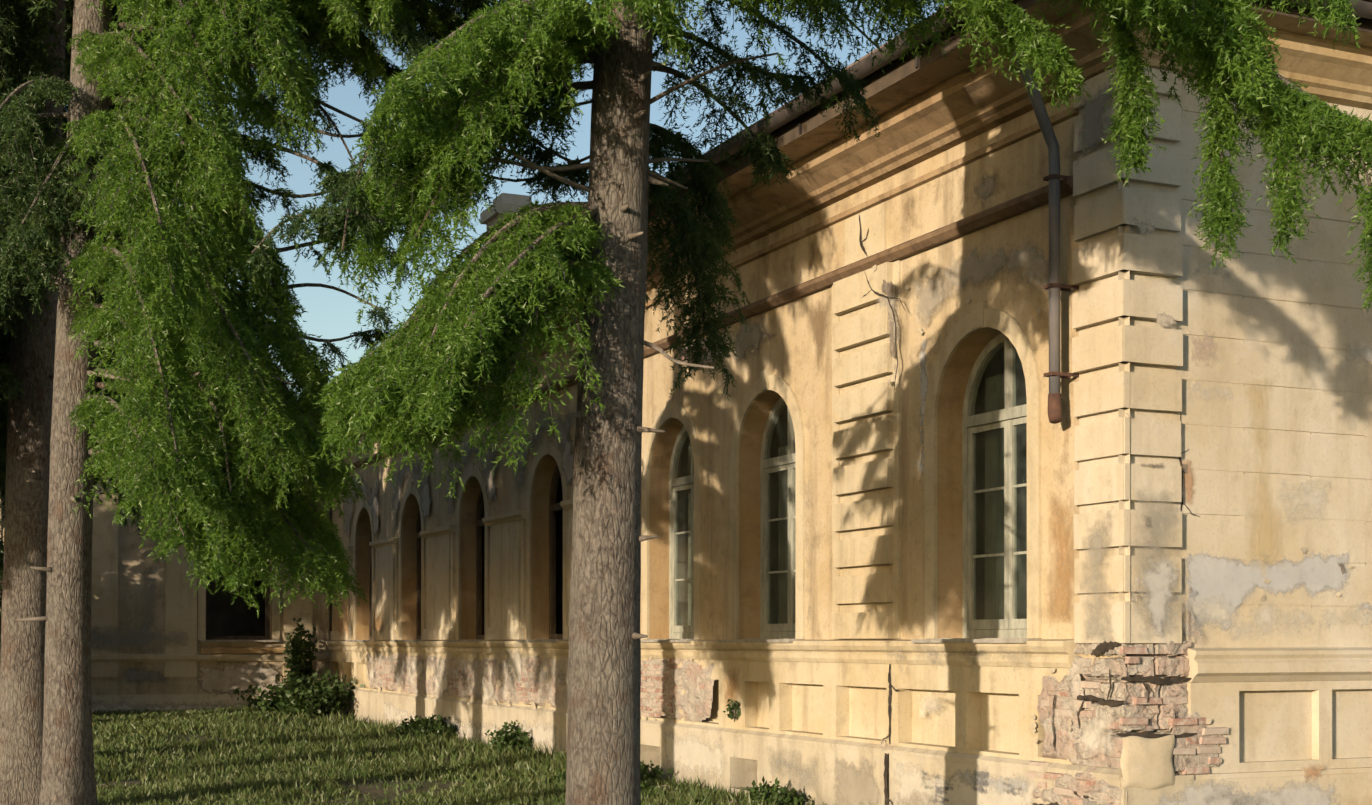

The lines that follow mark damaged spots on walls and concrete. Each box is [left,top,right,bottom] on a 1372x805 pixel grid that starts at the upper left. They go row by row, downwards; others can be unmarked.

crack [859,215,906,390]
crack [1179,414,1200,517]
flaking render [365,648,568,746]
flaking render [640,656,723,776]
crack [881,664,899,805]
flaking render [897,547,1354,805]